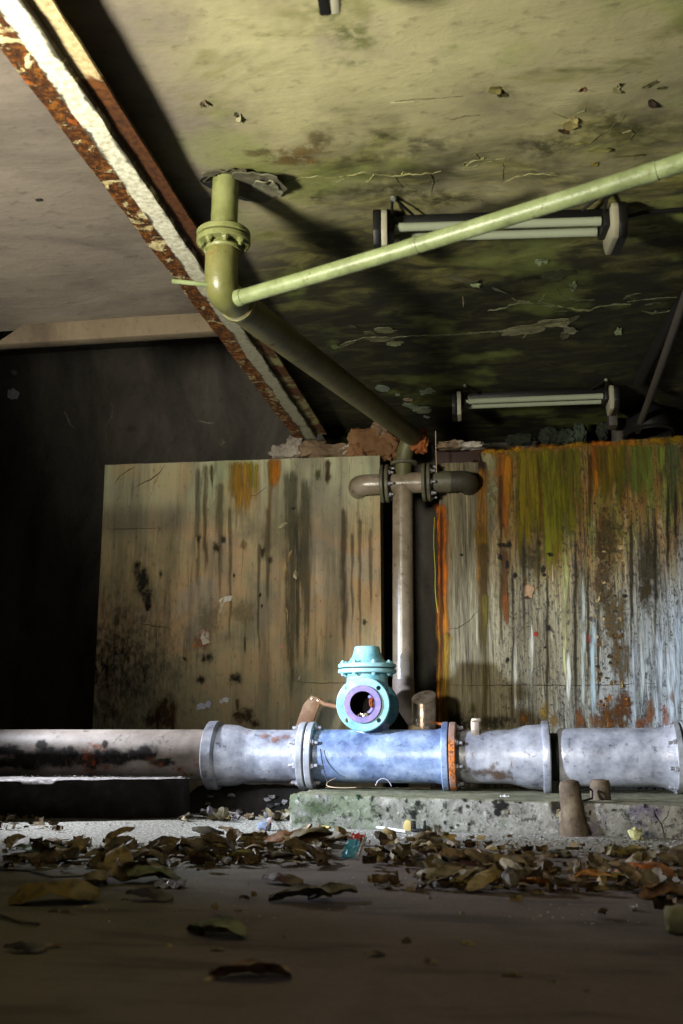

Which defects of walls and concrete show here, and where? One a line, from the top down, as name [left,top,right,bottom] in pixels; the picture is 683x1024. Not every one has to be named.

peeling [488,86,509,98]
peeling [641,80,667,109]
crack [284,154,580,191]
peeling [331,316,580,349]
spalling [268,421,400,462]
rust [231,460,280,510]
water stain [285,473,310,679]
rust [476,436,683,730]
rust [436,506,450,729]